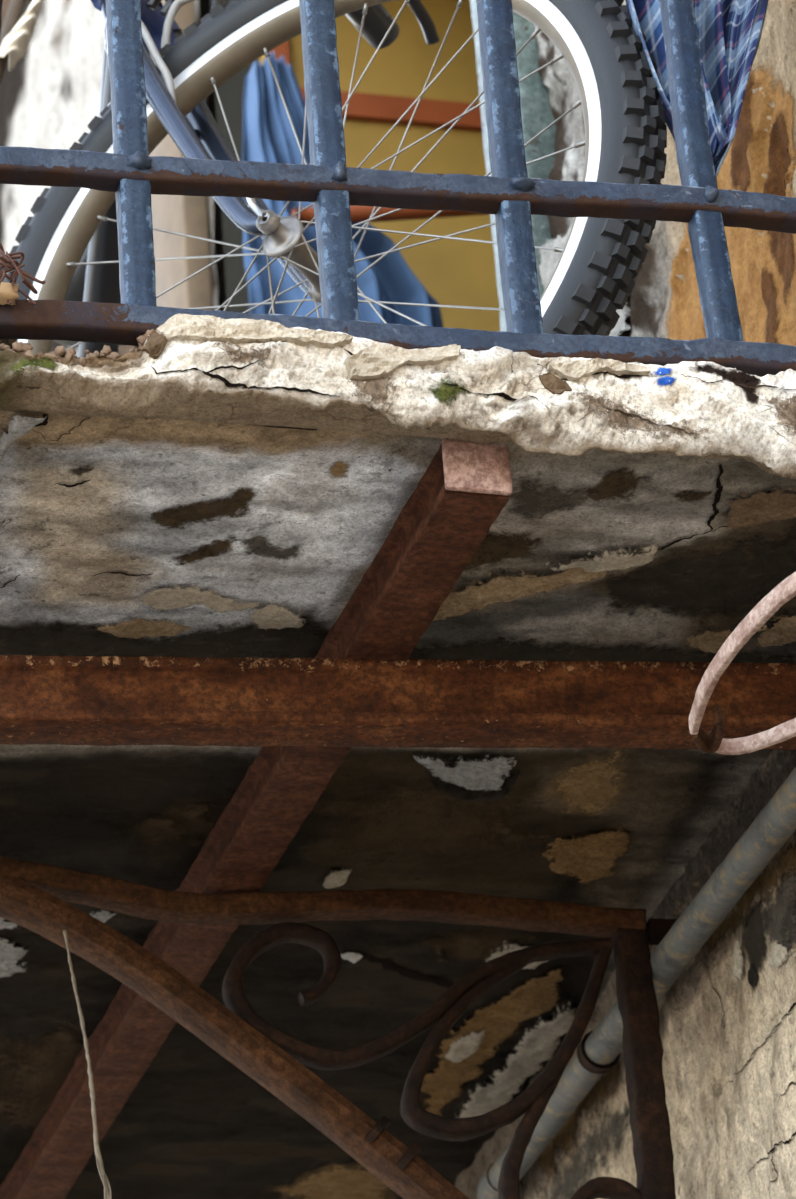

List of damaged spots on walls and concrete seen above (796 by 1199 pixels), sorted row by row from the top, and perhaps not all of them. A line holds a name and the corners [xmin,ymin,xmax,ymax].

peeling [609,303,631,336]
crack [151,360,340,397]
peeling [141,314,461,412]
spalling [539,358,713,443]
damp [150,488,255,529]
damp [464,467,652,572]
crack [644,464,728,555]
damp [173,536,299,564]
damp [408,637,717,662]
spalling [413,751,520,802]
crack [726,1003,796,1084]
crack [750,1132,796,1192]